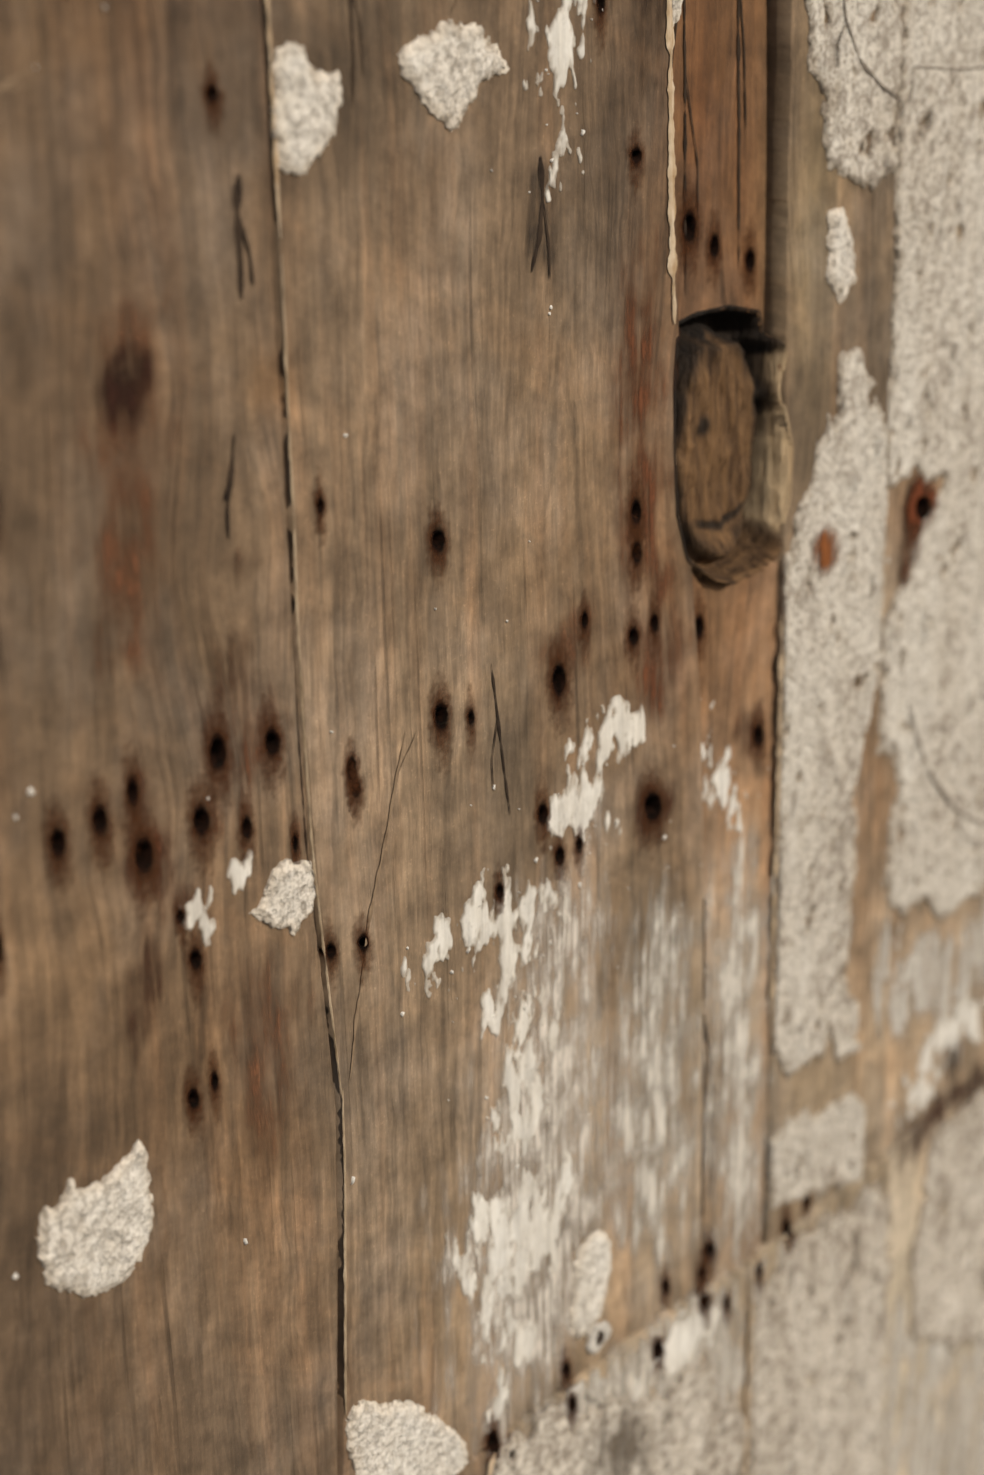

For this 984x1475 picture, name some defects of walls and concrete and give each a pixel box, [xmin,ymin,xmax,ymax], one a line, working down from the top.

peeling [397,0,595,203]
corrosion [815,528,837,572]
peeling [672,0,984,1130]
corrosion [904,478,937,584]
peeling [547,695,645,842]
corrosion [130,942,162,1034]
peeling [402,865,893,1475]
peeling [909,1089,984,1351]
peeling [345,1399,469,1475]